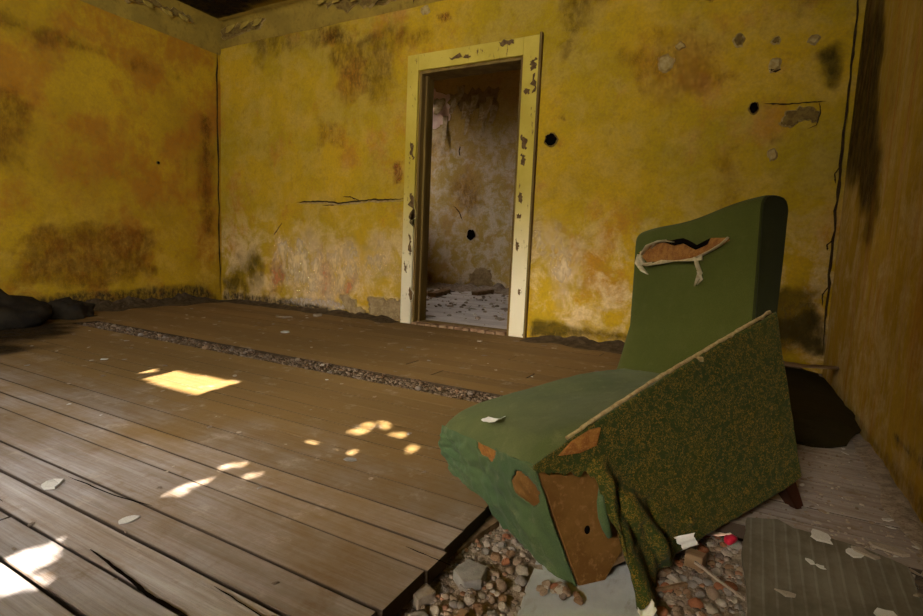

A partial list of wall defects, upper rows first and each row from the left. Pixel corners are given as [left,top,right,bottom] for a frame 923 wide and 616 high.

peeling [316,0,396,14]
peeling [523,57,538,95]
peeling [433,88,451,148]
flaking render [778,105,820,128]
crack [822,0,859,355]
crack [298,196,404,206]
damp [777,287,825,354]